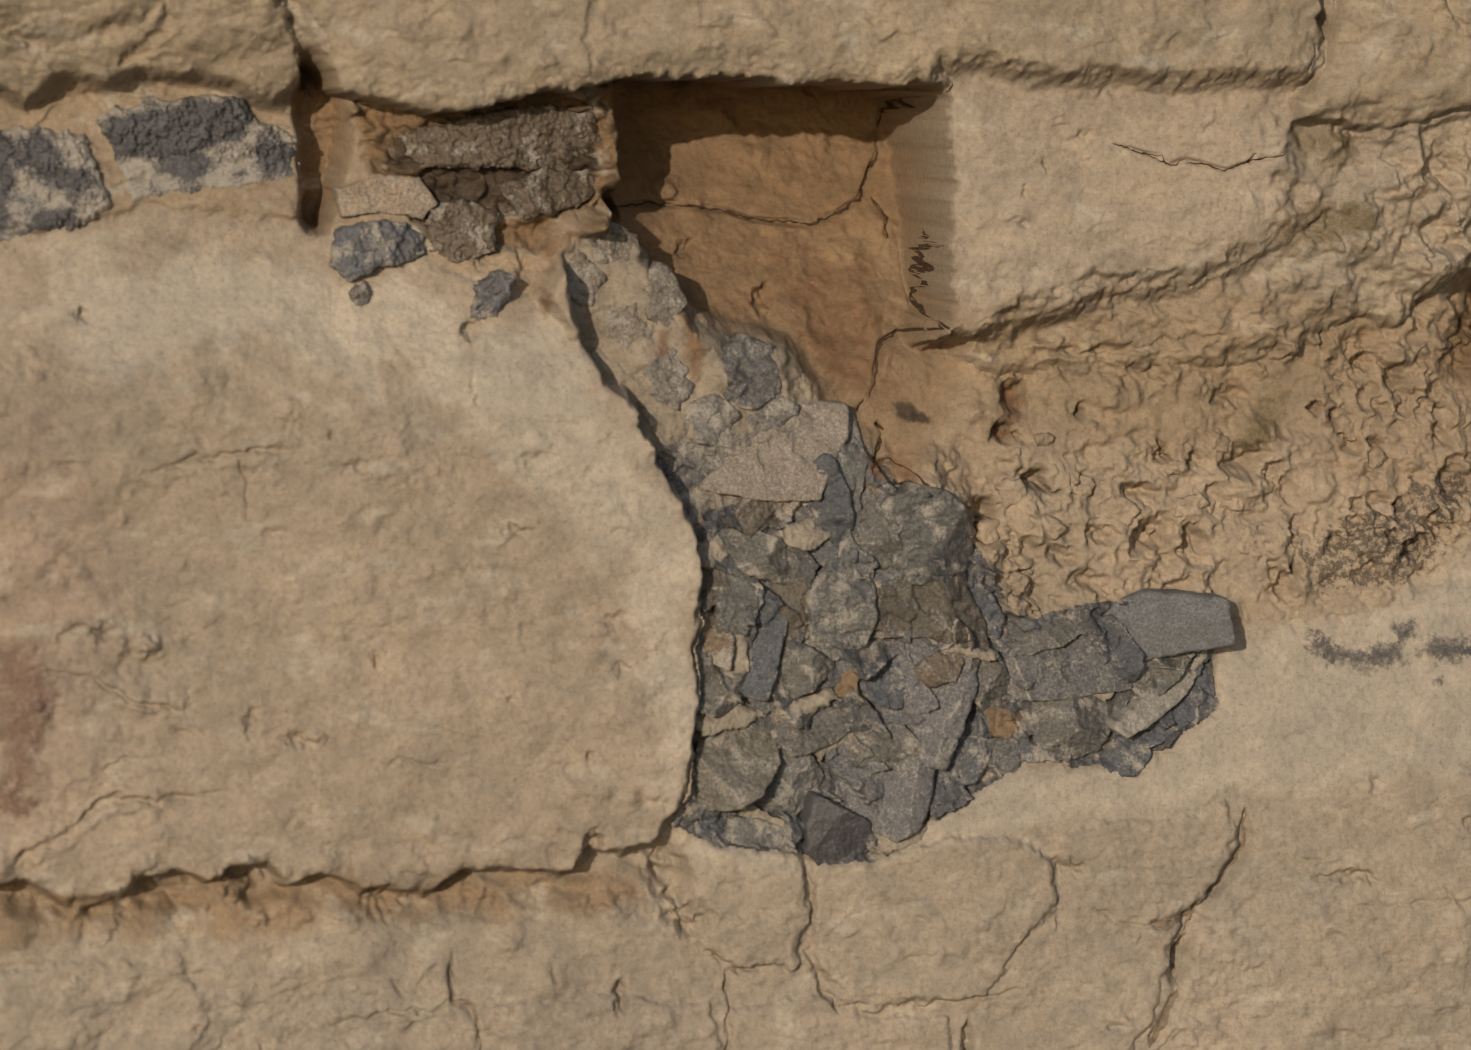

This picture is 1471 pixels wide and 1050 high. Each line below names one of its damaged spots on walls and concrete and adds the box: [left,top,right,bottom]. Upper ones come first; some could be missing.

crack [1111,142,1287,171]
spalling [565,222,688,349]
crack [610,83,953,486]
spalling [644,269,1471,866]
crack [449,949,482,1050]
crack [1149,811,1246,1048]